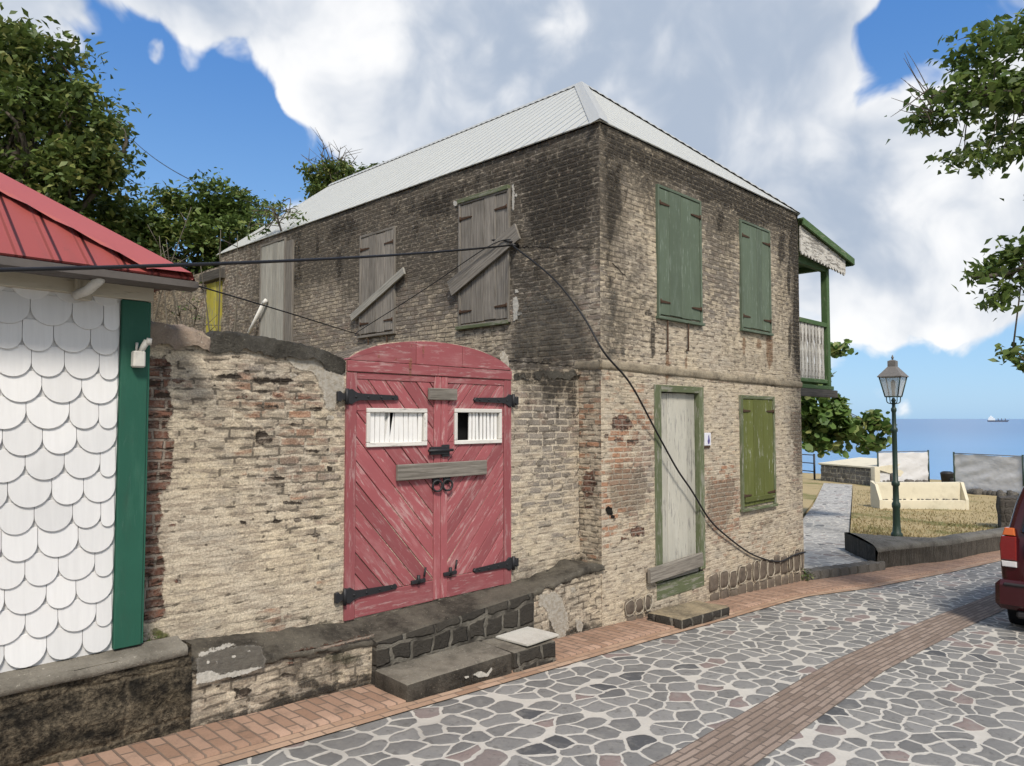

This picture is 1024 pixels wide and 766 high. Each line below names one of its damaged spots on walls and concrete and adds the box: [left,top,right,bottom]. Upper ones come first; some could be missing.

damp [390,133,801,375]
spalling [604,412,639,444]
spalling [144,355,185,623]
spalling [582,445,597,509]
spalling [621,526,644,544]
flaking render [538,584,583,638]
peeling [196,642,261,699]